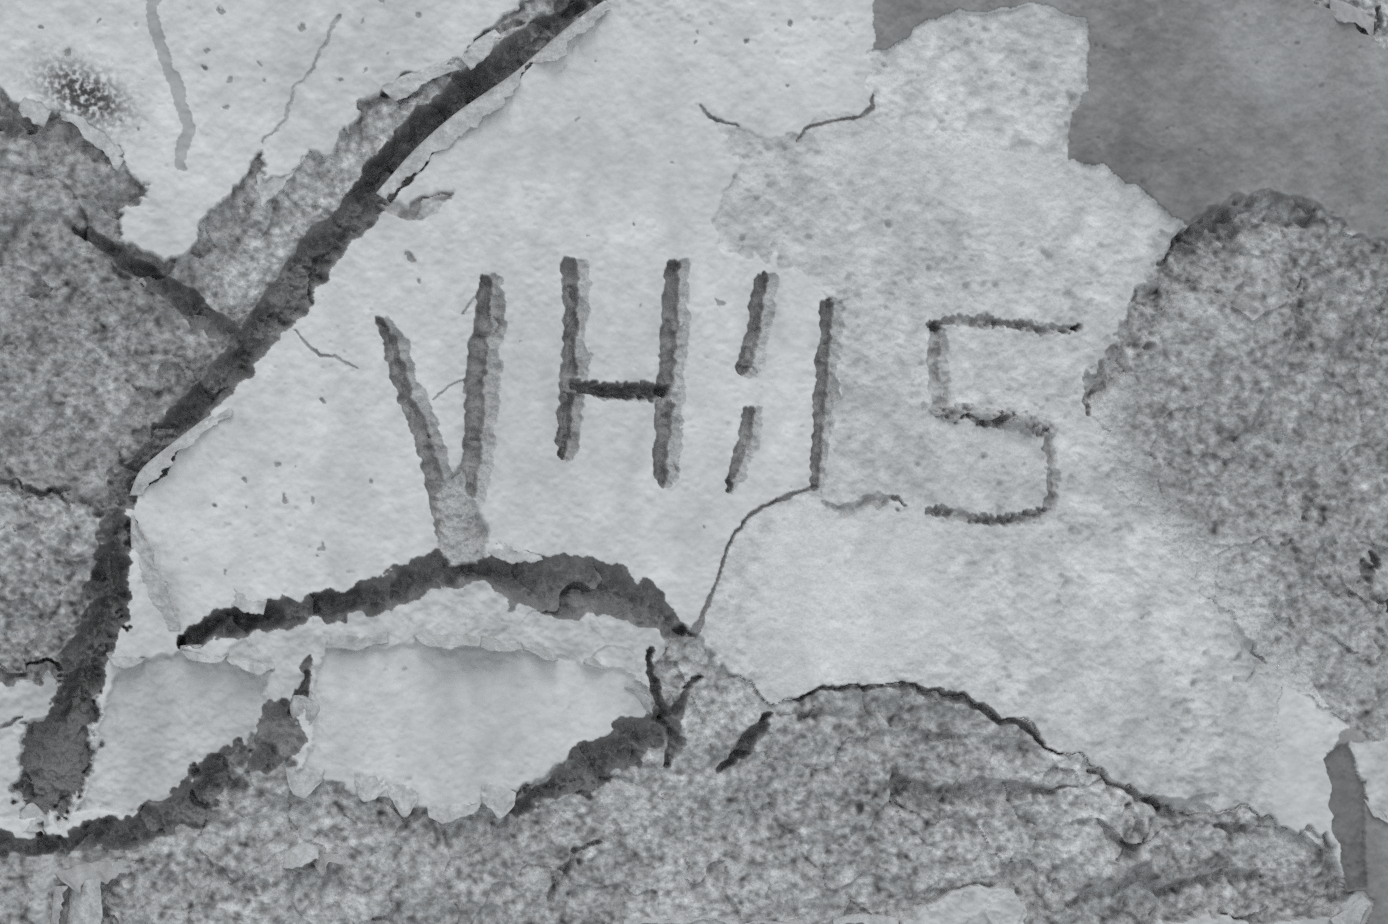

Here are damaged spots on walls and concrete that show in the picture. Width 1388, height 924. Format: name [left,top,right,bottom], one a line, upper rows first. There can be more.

spalling [476,0,557,48]
spalling [576,0,602,20]
crack [796,94,876,143]
spalling [1313,0,1388,51]
spalling [0,59,468,501]
crack [14,0,813,855]
spalling [1087,189,1388,742]
spalling [0,632,1371,924]